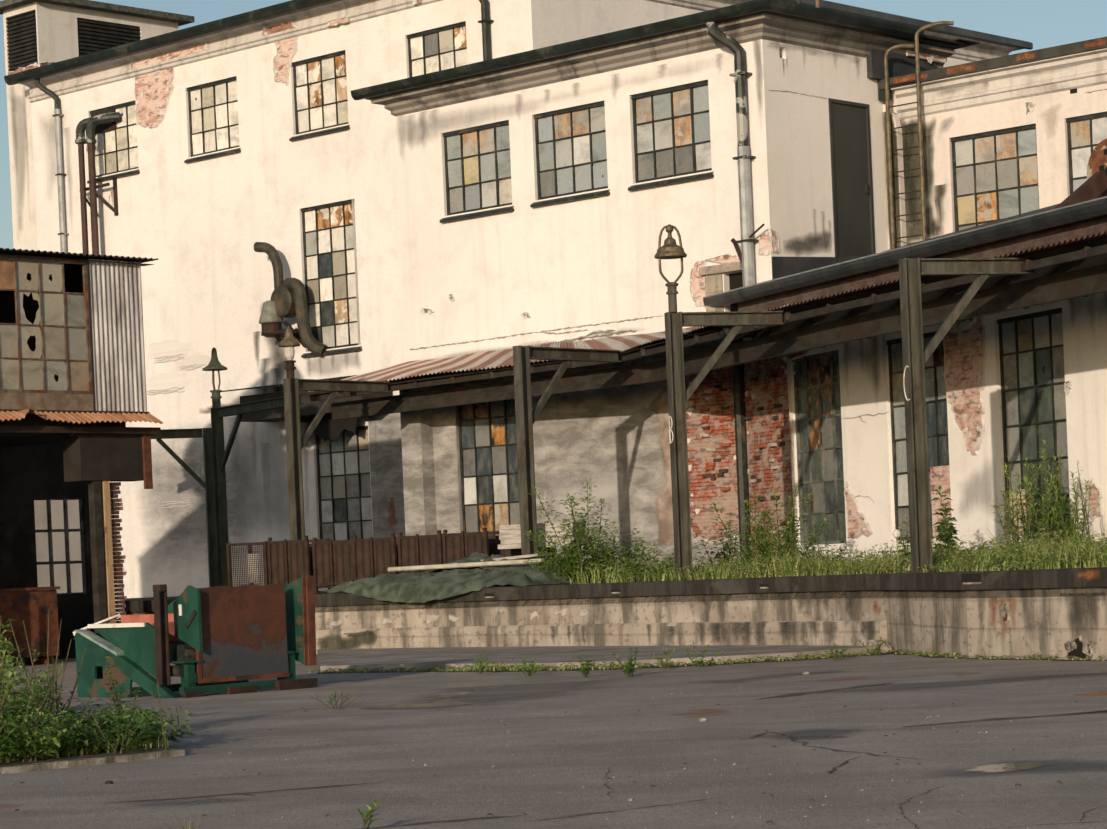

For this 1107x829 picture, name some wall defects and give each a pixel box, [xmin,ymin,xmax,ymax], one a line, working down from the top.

peeling [131,43,205,129]
peeling [263,22,300,86]
leakage [884,112,945,221]
peeling [689,253,740,308]
peeling [943,316,987,456]
flaking render [685,350,811,561]
peeling [844,481,873,539]
peeling [1084,477,1103,521]
spalling [1064,634,1098,660]